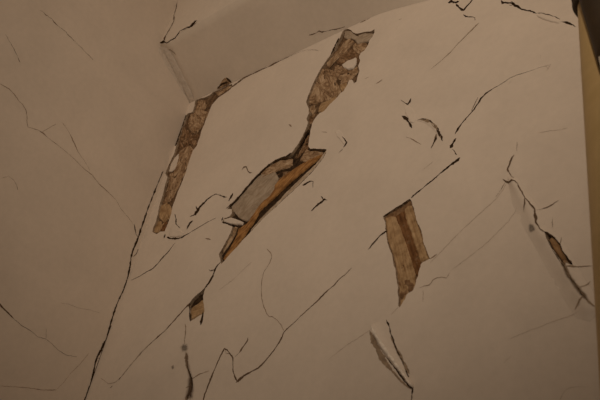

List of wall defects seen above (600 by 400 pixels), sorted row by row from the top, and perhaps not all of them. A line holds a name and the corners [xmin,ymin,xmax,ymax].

crack [160,4,197,44]
crack [501,0,576,27]
flaking render [152,46,232,234]
flaking render [219,29,374,264]
crack [411,64,551,198]
crack [0,84,348,400]
flaking render [383,199,430,307]
flaking render [544,231,574,266]
flaking render [188,288,205,321]
crack [508,262,595,340]
peeling [370,320,414,389]